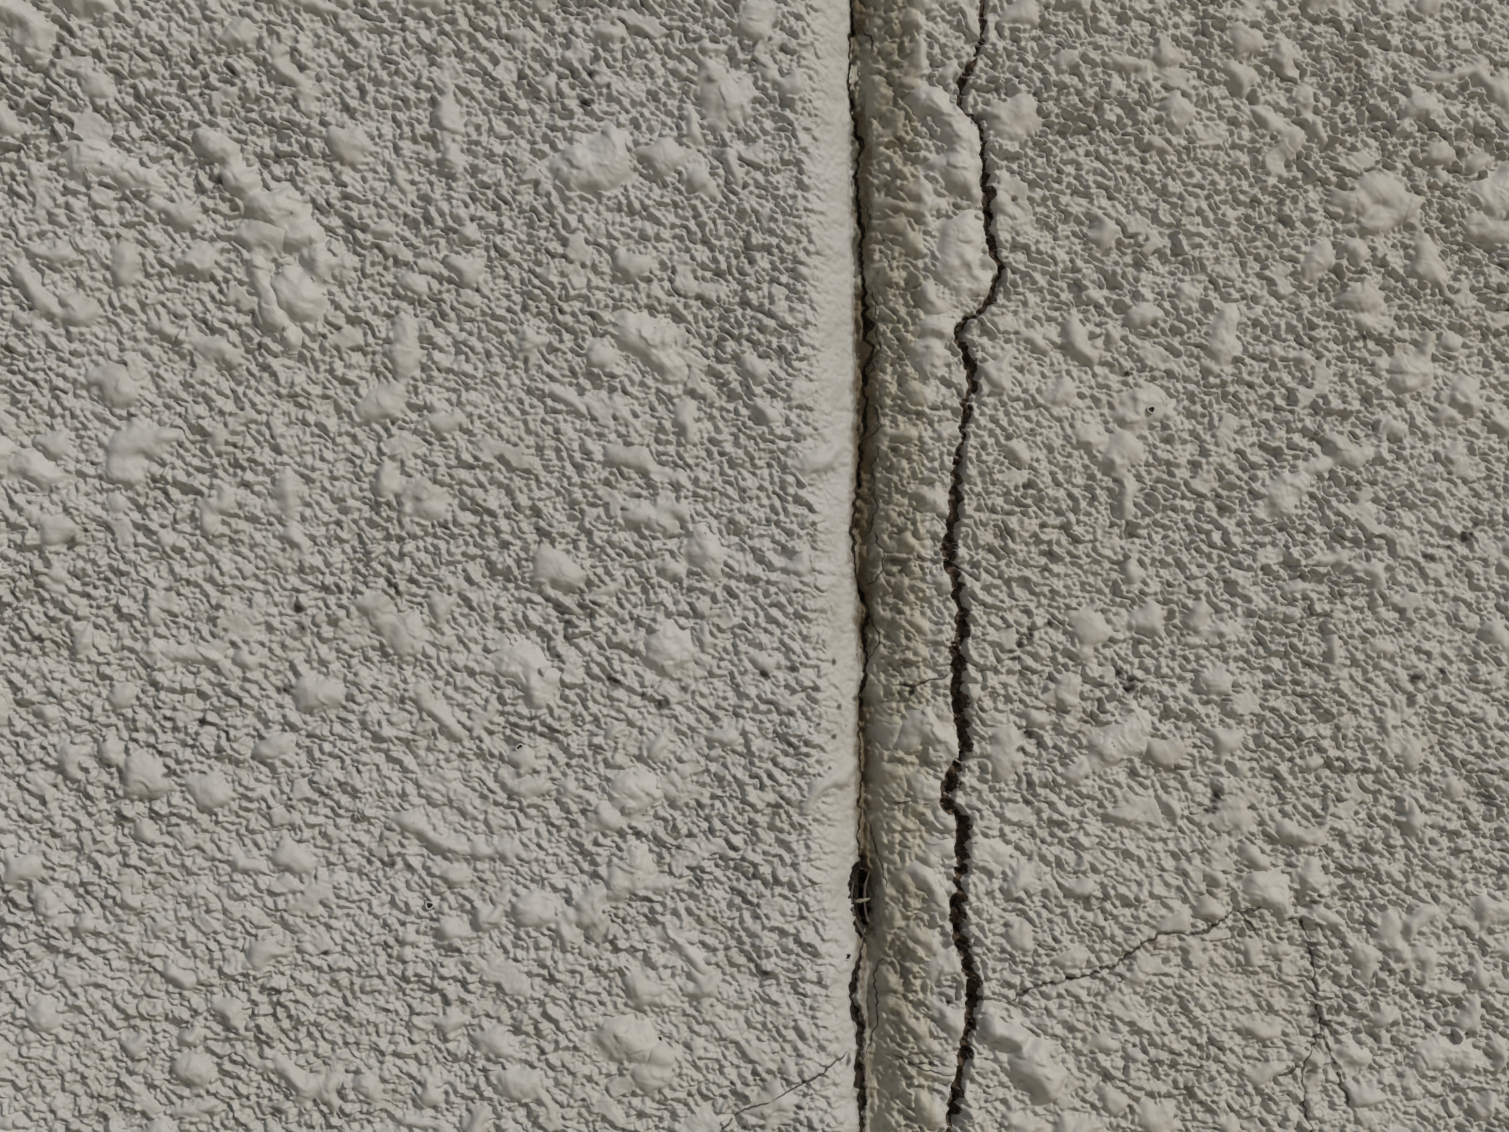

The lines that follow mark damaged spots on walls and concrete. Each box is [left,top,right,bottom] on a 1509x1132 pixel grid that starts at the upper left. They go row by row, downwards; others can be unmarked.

crack [722,0,1351,1132]